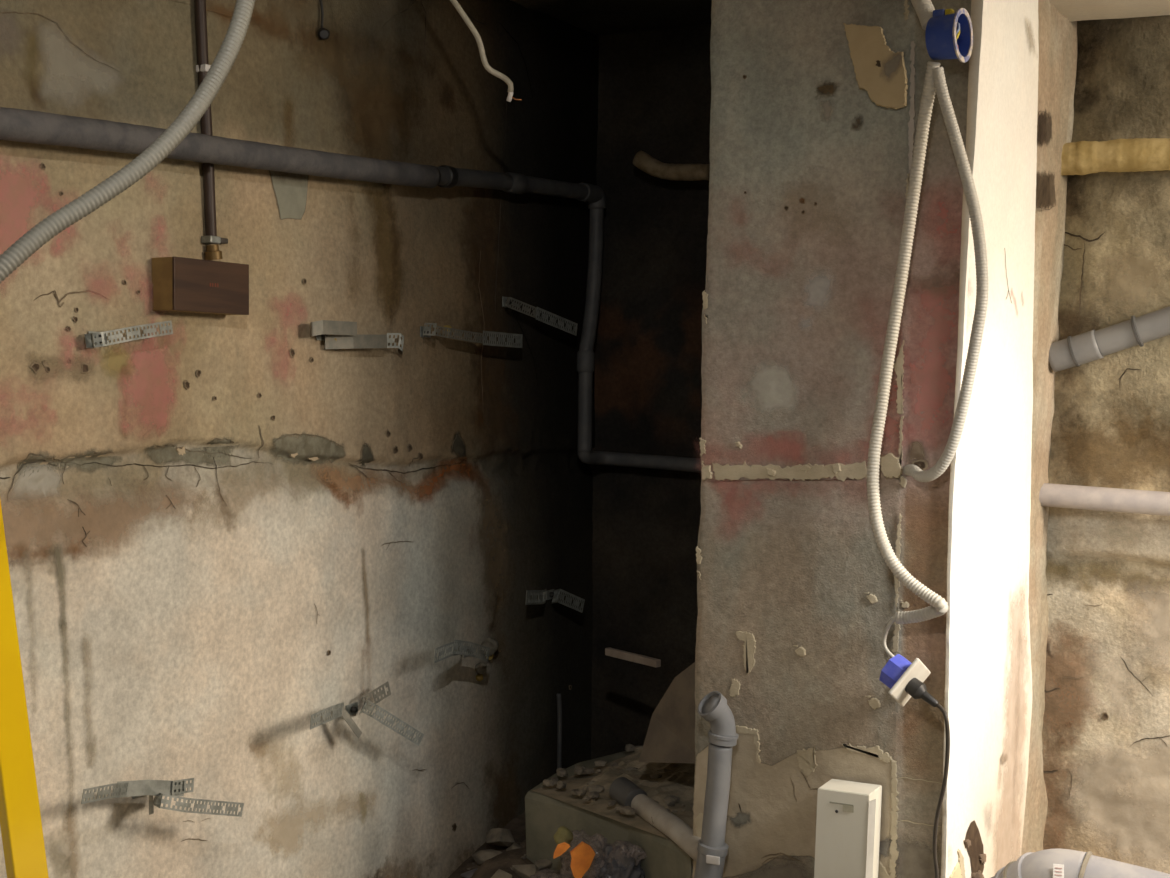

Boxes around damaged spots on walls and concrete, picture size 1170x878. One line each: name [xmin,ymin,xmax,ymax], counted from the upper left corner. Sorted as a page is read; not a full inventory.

leakage [371,192,401,312]
crack [33,290,110,307]
flaking render [17,451,117,475]
crack [0,426,274,547]
flaking render [145,438,243,465]
flaking render [271,433,345,464]
flaking render [358,443,374,465]
rust [317,460,486,503]
leakage [2,489,196,672]
peeling [842,743,899,878]
spalling [949,820,986,878]